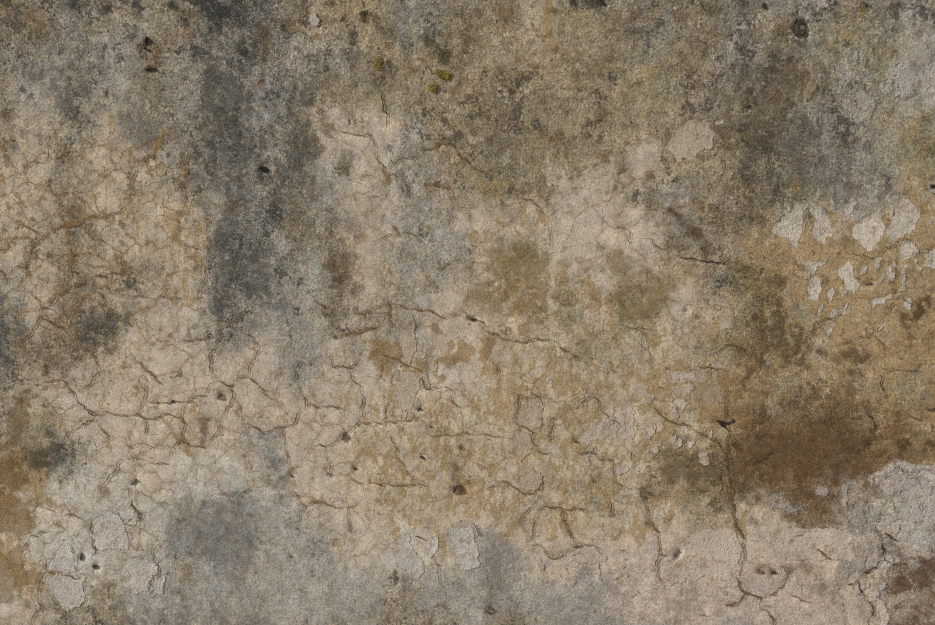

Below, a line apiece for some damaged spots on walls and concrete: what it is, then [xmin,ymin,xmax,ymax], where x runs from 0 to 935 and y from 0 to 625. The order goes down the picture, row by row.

crack [338,52,483,197]
damp [836,51,919,124]
damp [752,274,823,369]
peeling [771,195,834,248]
peeling [802,195,935,336]
damp [900,298,929,328]
crack [0,131,578,625]
damp [779,347,871,423]
crack [485,480,601,559]
crack [653,343,811,625]
damp [868,461,935,532]
crack [848,526,906,625]